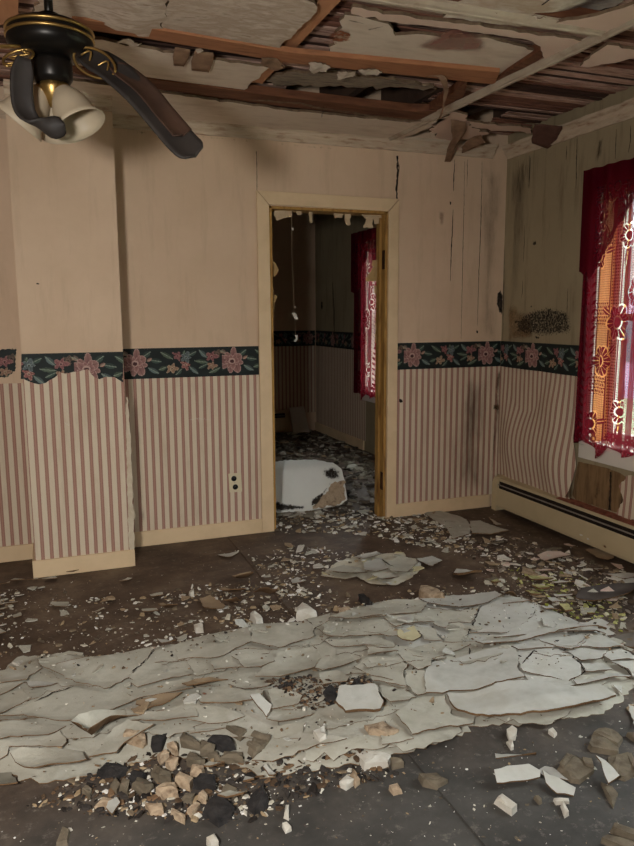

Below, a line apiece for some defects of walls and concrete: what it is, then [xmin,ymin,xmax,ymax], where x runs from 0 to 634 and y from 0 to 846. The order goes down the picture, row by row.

flaking render [308,61,382,80]
crack [393,156,401,199]
damp [497,291,570,339]
peeling [572,462,626,512]